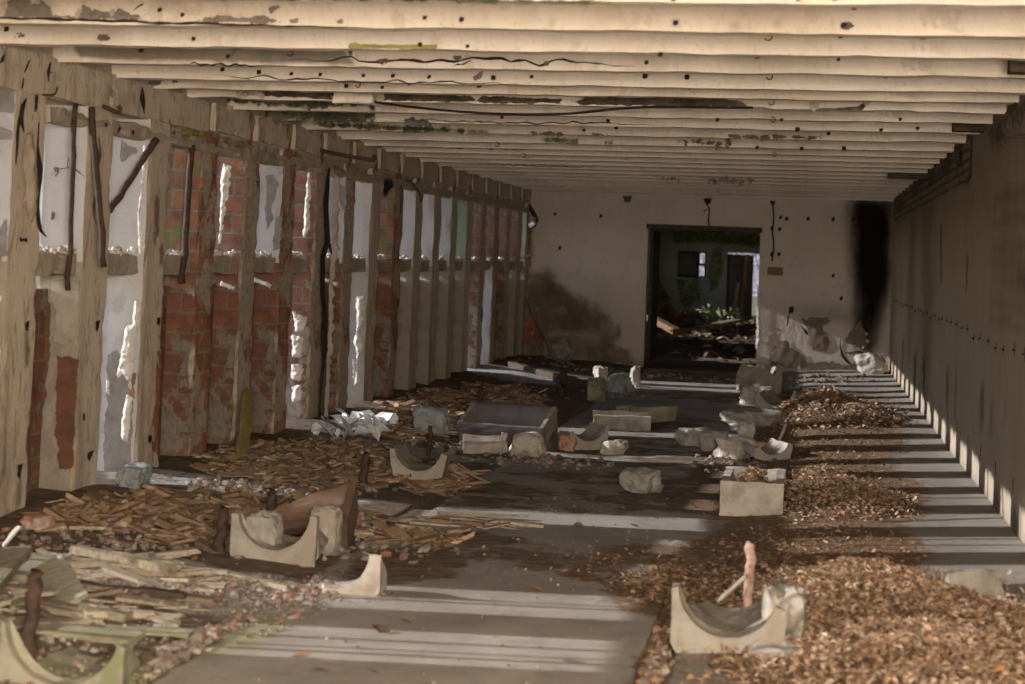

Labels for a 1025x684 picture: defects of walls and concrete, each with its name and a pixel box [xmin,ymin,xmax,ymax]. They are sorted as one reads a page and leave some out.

peeling [0,0,142,21]
peeling [203,6,280,24]
flaking render [0,89,15,113]
spalling [236,91,337,105]
spalling [376,94,562,105]
spalling [576,97,747,106]
spalling [218,163,232,244]
flaking render [768,306,856,371]
flaking render [843,322,869,349]
flaking render [41,279,80,469]
flaking render [103,300,142,472]